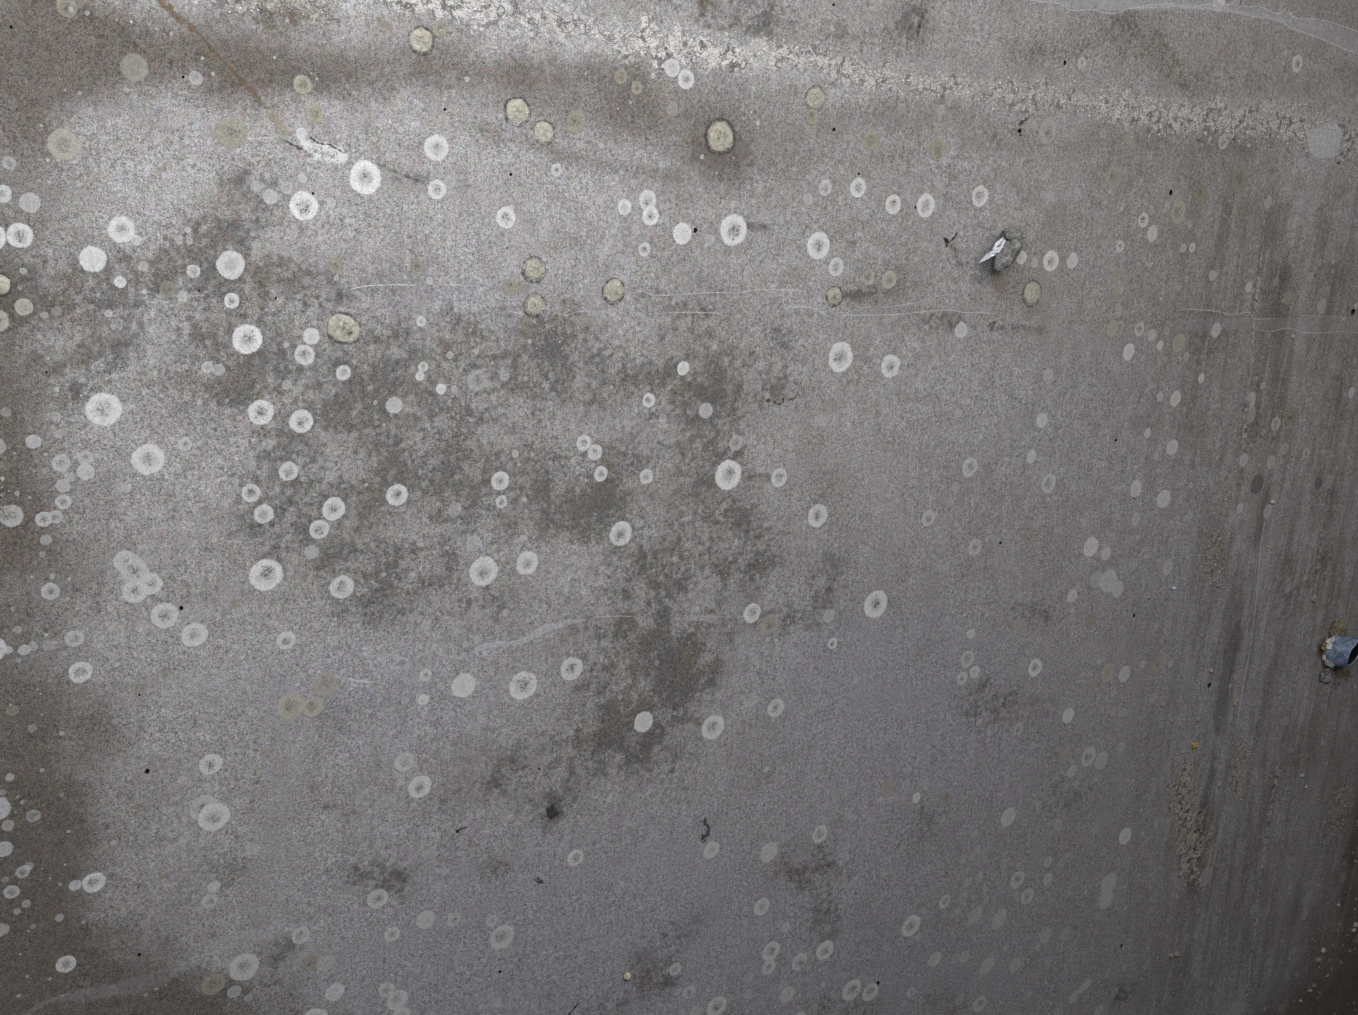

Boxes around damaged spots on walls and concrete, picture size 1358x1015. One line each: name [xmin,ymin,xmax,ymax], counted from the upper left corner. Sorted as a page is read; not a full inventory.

water stain [350,160,381,194]
water stain [0,185,38,249]
water stain [263,189,319,221]
water stain [79,216,142,288]
water stain [216,251,245,309]
water stain [233,324,262,354]
water stain [85,393,123,426]
water stain [289,409,313,433]
water stain [715,435,742,490]
water stain [309,497,345,539]
water stain [249,559,283,591]
peeling [1322,636,1335,668]